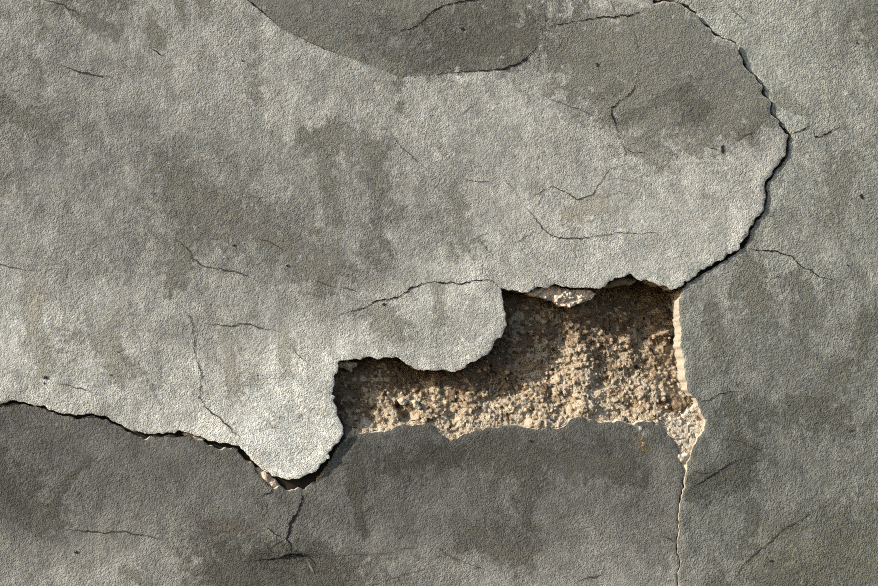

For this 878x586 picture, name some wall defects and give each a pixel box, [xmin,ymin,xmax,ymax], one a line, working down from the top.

crack [379,0,475,31]
crack [420,0,661,76]
crack [461,74,664,256]
spalling [653,0,791,261]
crack [700,125,844,280]
crack [319,279,492,314]
crack [0,306,415,564]
flaking render [4,264,719,586]
crack [679,439,759,500]
crack [366,547,487,586]